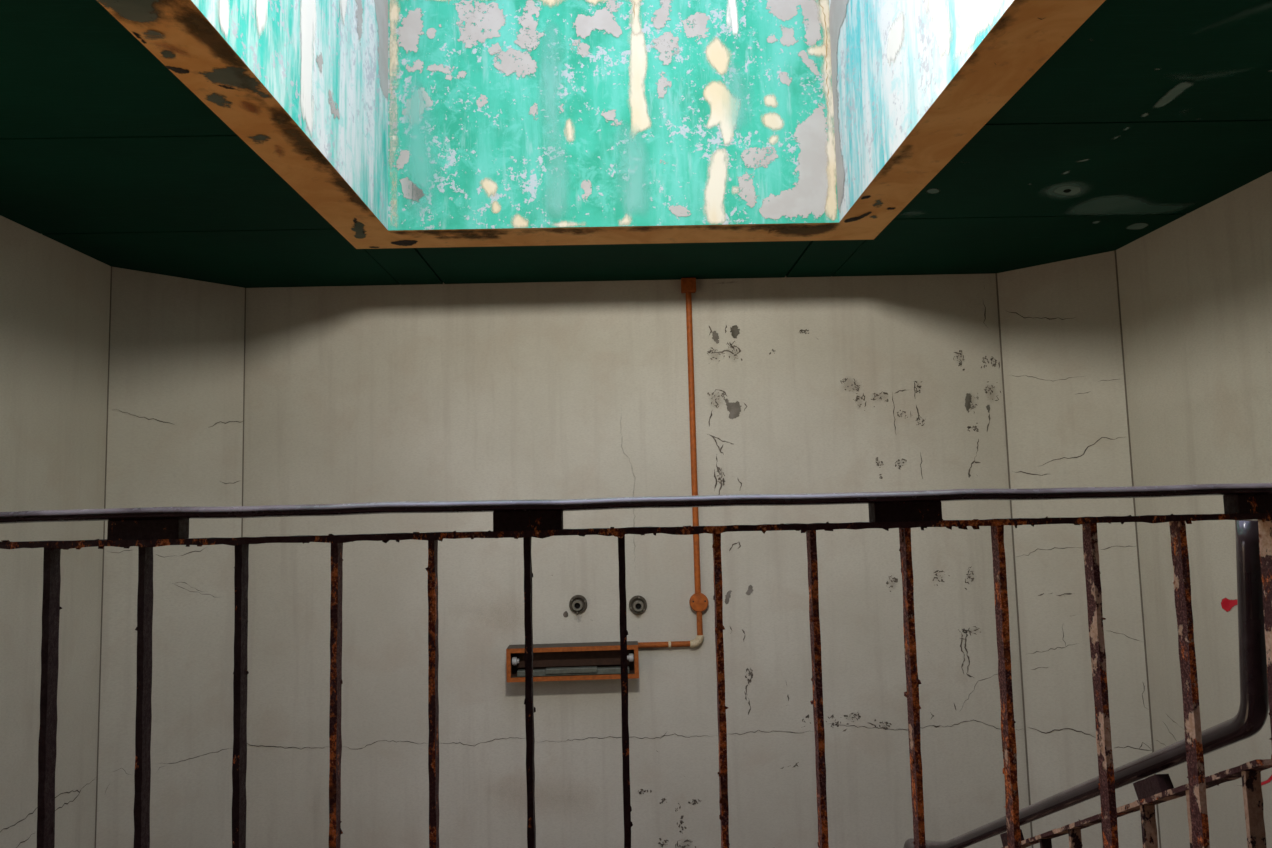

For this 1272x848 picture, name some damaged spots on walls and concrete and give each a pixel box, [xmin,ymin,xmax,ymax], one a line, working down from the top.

peeling [97,0,271,113]
peeling [356,0,467,125]
peeling [454,0,545,78]
peeling [569,0,622,57]
peeling [650,0,710,99]
peeling [601,109,622,126]
peeling [737,0,895,223]
peeling [249,110,418,248]
peeling [394,150,424,202]
flaking render [707,325,742,364]
flaking render [707,389,747,427]
crack [1012,437,1123,476]